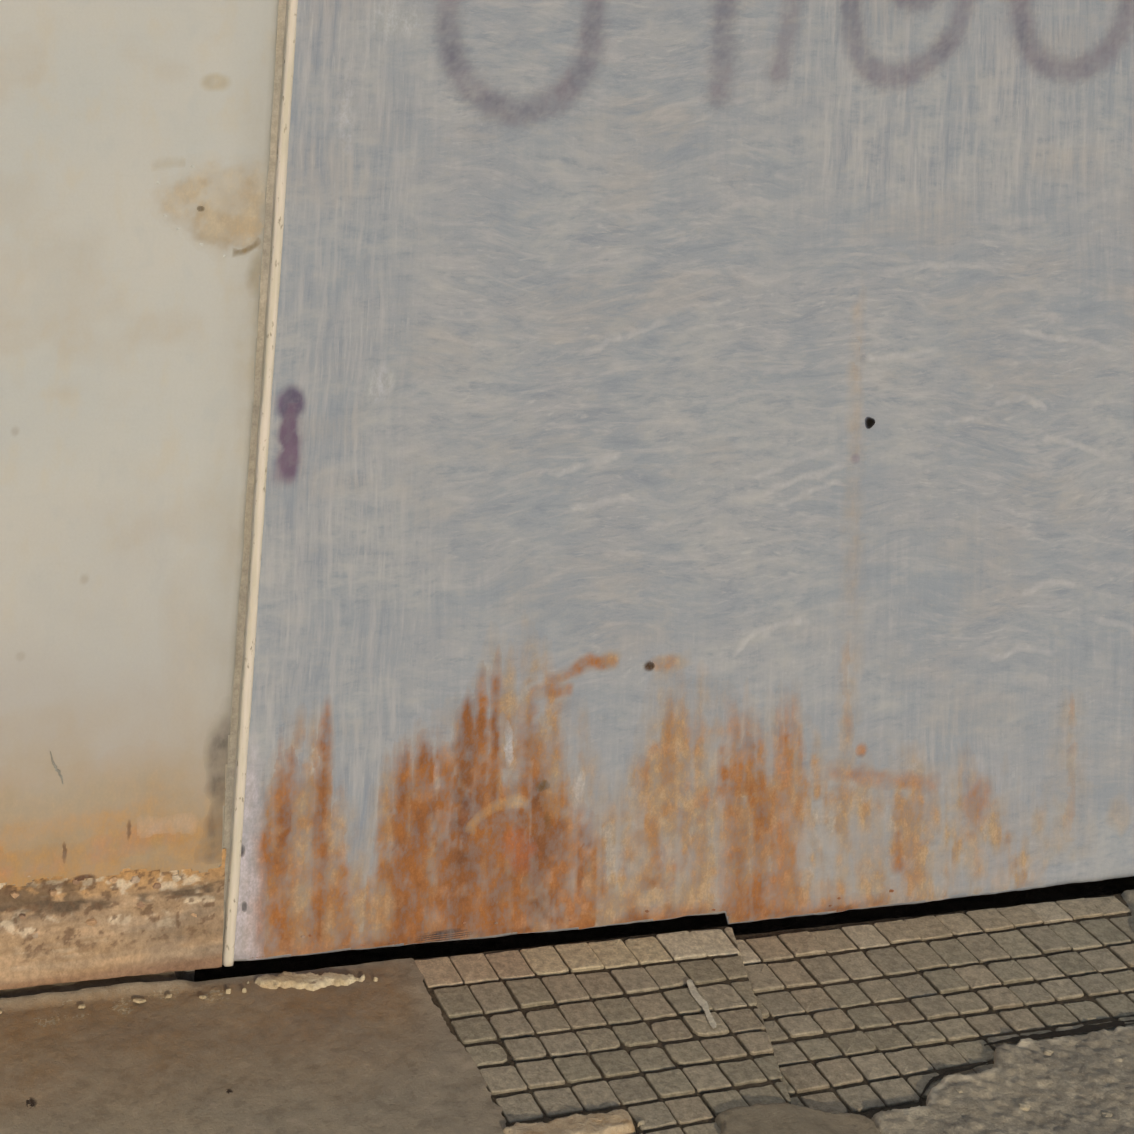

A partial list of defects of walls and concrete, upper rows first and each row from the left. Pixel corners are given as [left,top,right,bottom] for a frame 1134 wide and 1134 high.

corrosion [0,274,1050,1134]
flaking render [0,727,268,1014]
spalling [199,971,378,1010]